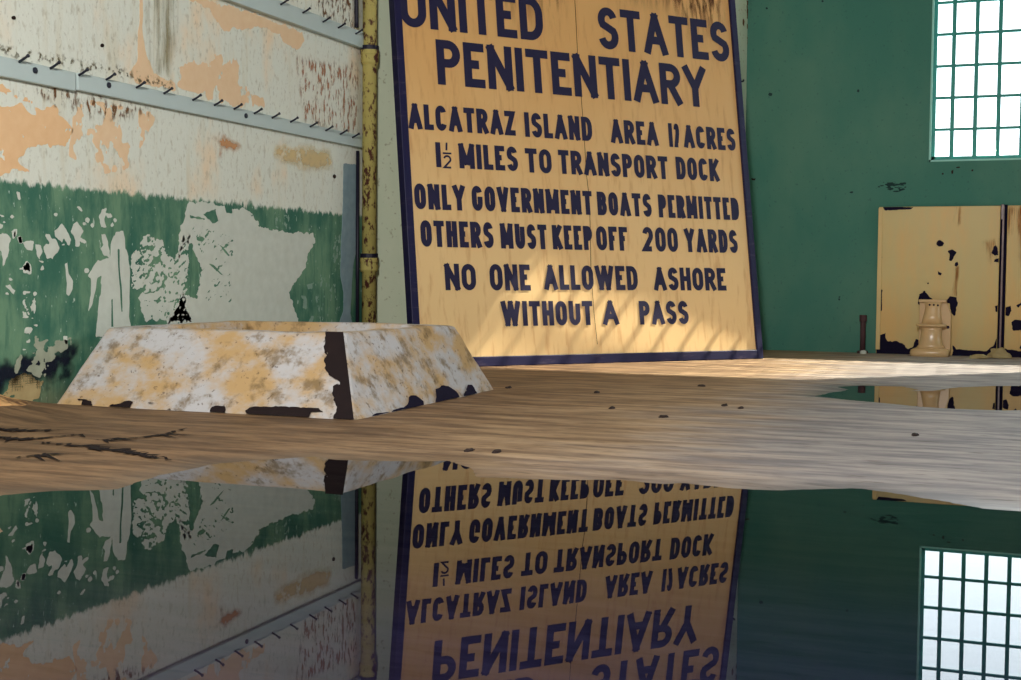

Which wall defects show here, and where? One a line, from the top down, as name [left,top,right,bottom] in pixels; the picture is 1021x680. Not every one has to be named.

peeling [129,0,265,108]
peeling [190,0,304,50]
peeling [0,84,155,176]
peeling [0,163,356,337]
peeling [3,278,71,401]